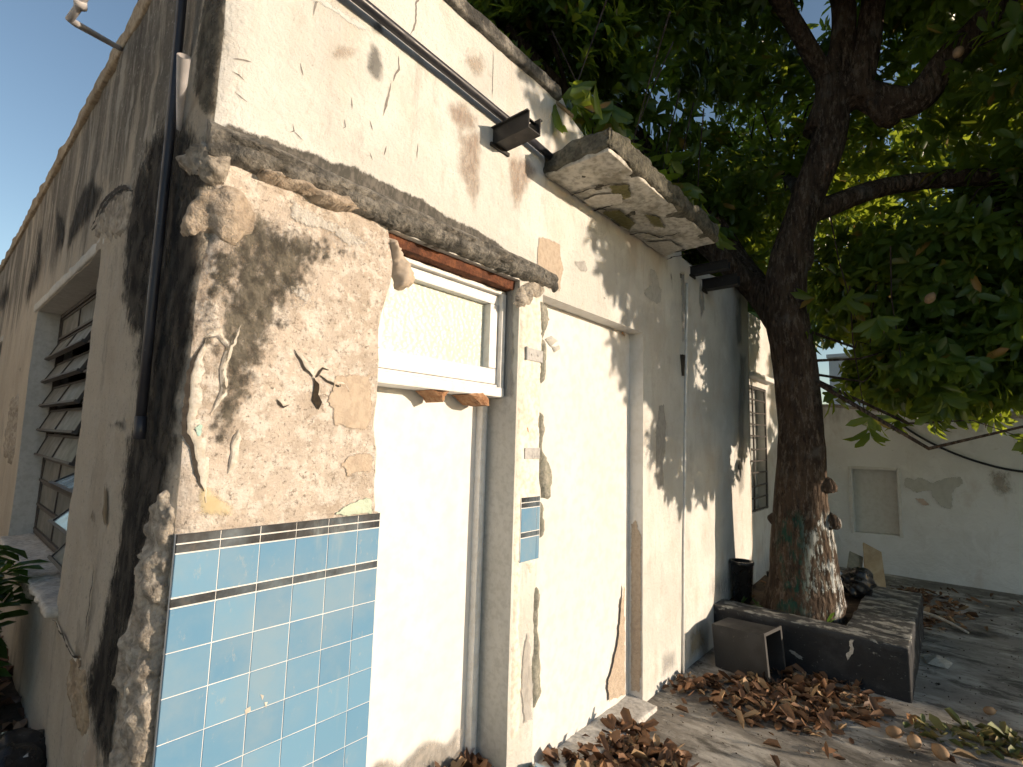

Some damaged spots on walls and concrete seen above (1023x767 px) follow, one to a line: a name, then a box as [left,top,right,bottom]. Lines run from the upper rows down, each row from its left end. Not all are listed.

water stain [193,0,225,113]
water stain [56,180,103,248]
flaking render [180,185,255,246]
flaking render [256,168,367,212]
water stain [225,124,507,251]
crack [181,326,241,503]
water stain [82,122,366,767]
crack [277,399,289,408]
crack [294,350,350,391]
peeling [503,237,564,740]
flaking render [108,489,175,767]
peeling [608,521,642,701]